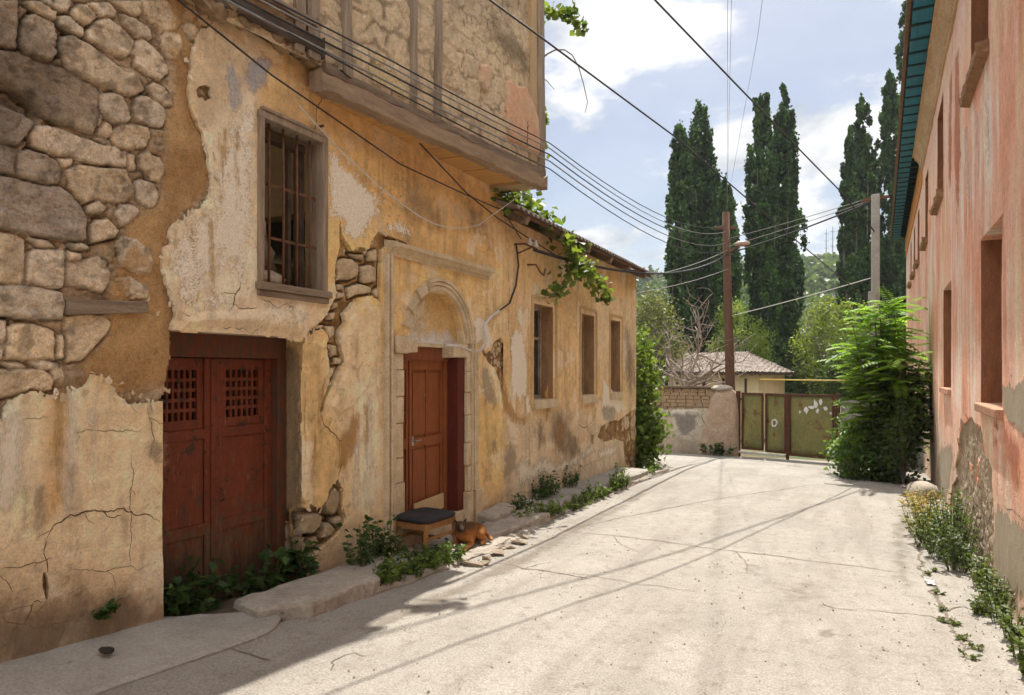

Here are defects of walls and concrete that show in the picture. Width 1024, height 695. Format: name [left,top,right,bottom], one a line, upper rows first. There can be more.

crack [0,407,163,631]
spalling [0,0,271,428]
spalling [285,477,351,581]
spalling [262,141,418,415]
peeling [473,306,531,415]
spalling [598,379,636,468]
spalling [937,413,1024,596]